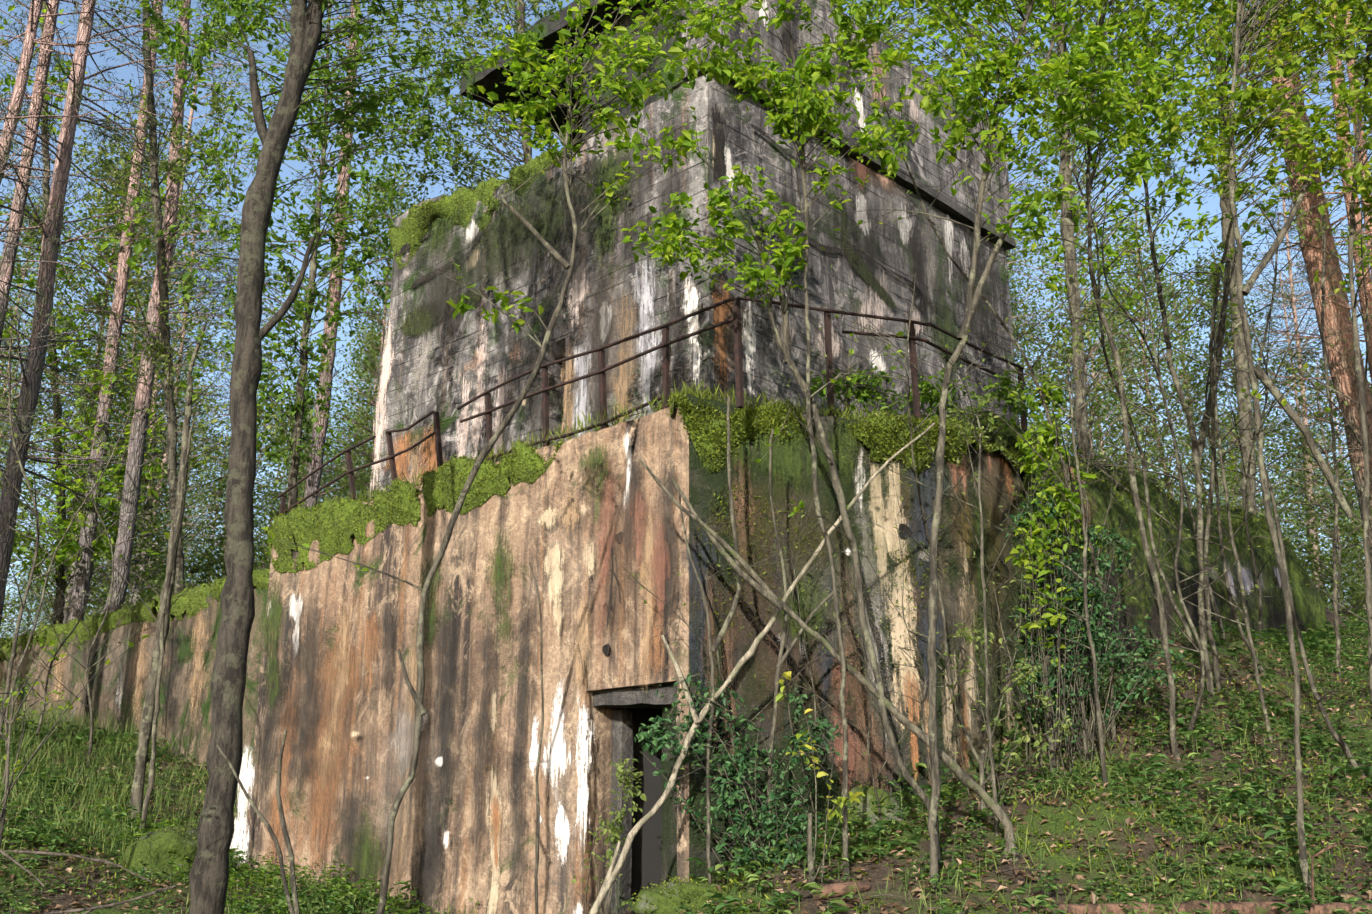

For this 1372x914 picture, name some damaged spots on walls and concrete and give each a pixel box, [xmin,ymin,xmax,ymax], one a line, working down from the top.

water stain [536,120,688,436]
water stain [455,314,487,459]
water stain [635,260,702,416]
rust [711,286,756,399]
rust [387,426,437,485]
water stain [593,435,641,550]
spalling [898,523,913,540]
water stain [376,593,397,699]
water stain [395,530,594,913]
water stain [322,794,385,893]